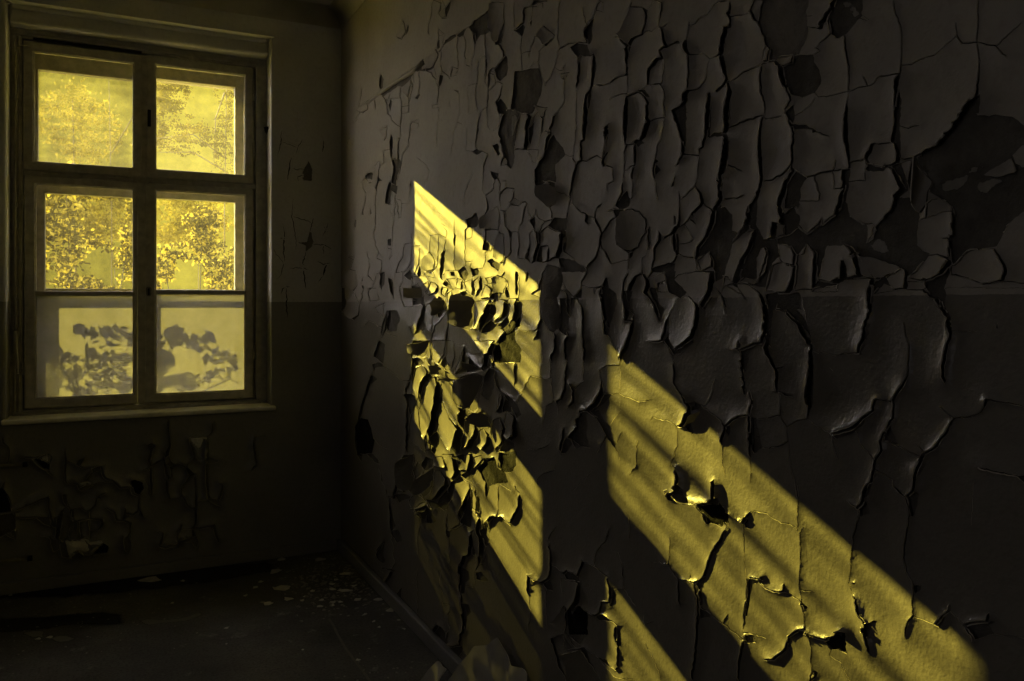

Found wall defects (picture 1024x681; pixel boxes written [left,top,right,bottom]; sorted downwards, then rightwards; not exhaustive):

peeling [367,0,1024,565]
flaking render [356,418,375,456]
peeling [670,488,747,638]
peeling [420,638,527,681]
crack [744,579,752,643]
flaking render [819,633,847,652]